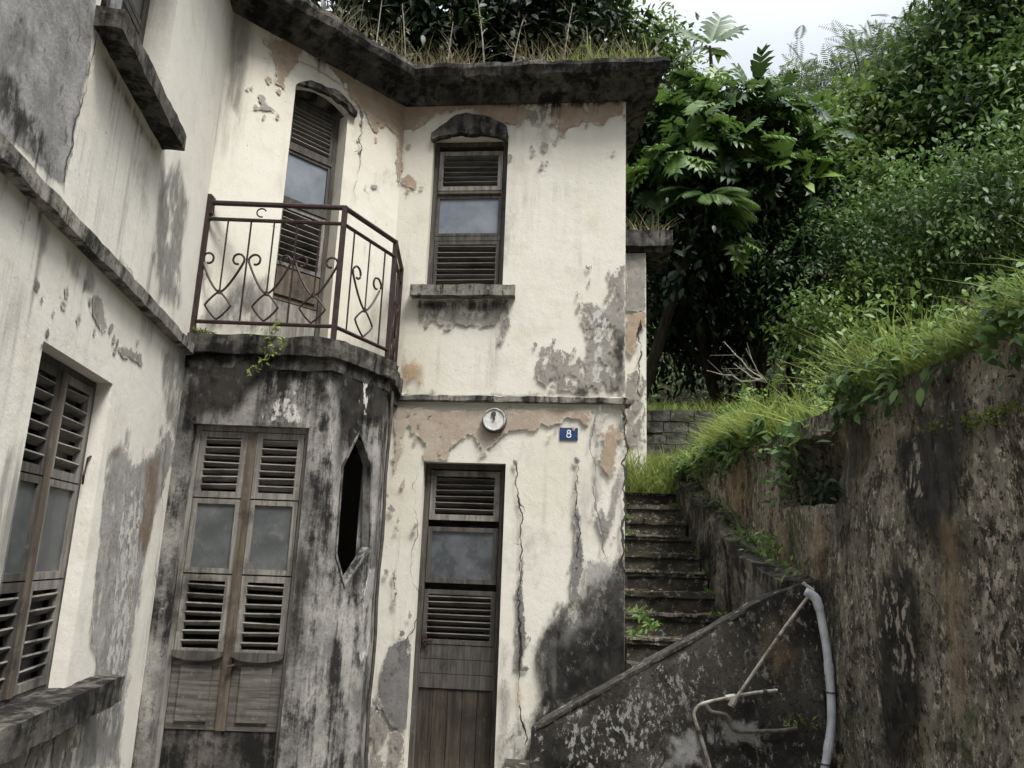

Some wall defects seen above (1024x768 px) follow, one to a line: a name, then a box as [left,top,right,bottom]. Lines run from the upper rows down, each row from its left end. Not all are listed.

water stain [0,0,96,183]
crack [354,103,364,187]
peeling [246,38,626,195]
water stain [155,167,187,301]
peeling [262,386,302,423]
water stain [314,370,388,433]
peeling [392,246,647,619]
crack [573,319,643,585]
spalling [368,630,411,768]
crack [513,456,528,749]
water stain [534,556,625,724]
water stain [876,566,919,766]